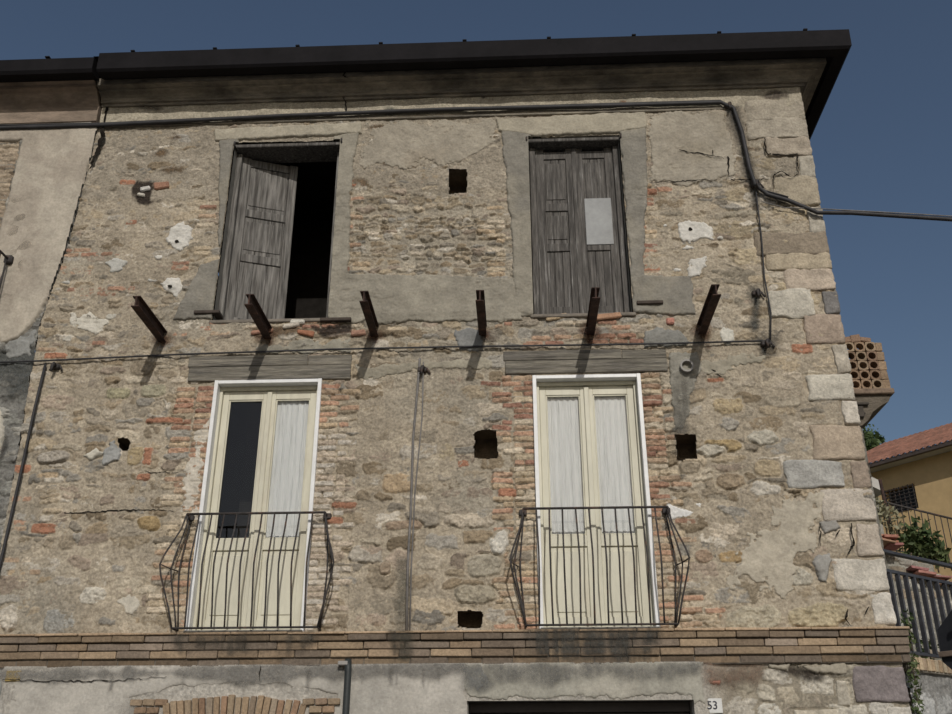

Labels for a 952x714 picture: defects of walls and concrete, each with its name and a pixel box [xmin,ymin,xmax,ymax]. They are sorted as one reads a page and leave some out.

crack [89,107,109,169]
crack [651,138,799,192]
spalling [5,329,38,359]